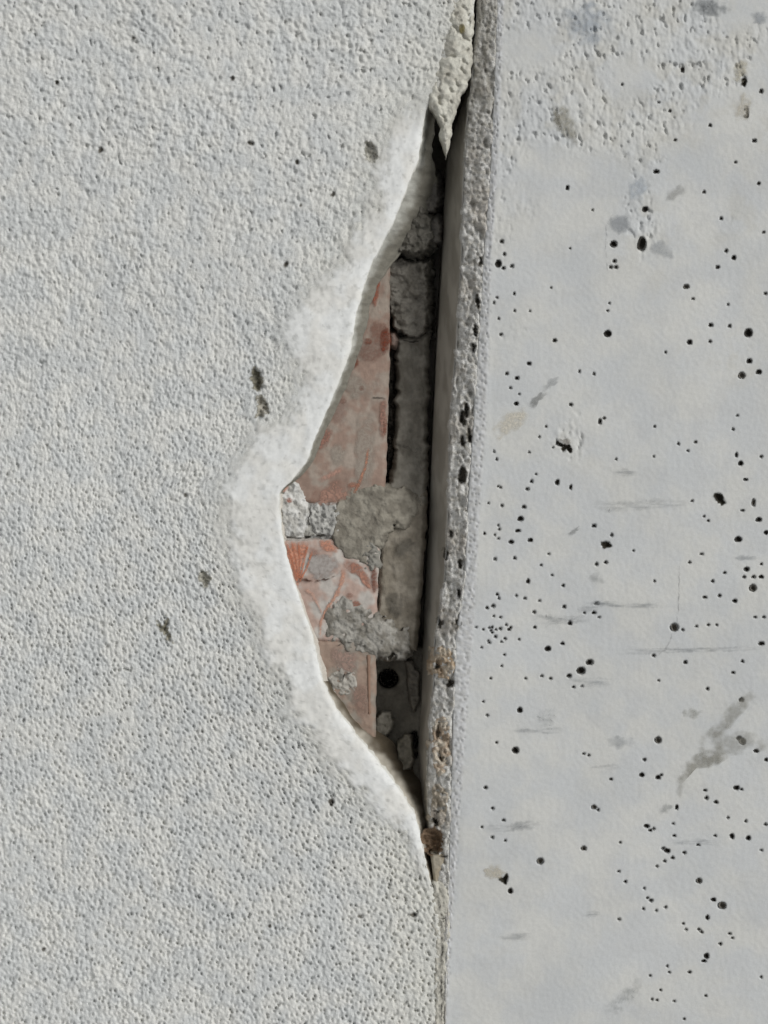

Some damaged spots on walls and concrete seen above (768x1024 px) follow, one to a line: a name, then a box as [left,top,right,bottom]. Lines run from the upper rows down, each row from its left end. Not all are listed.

spalling [208,0,475,886]